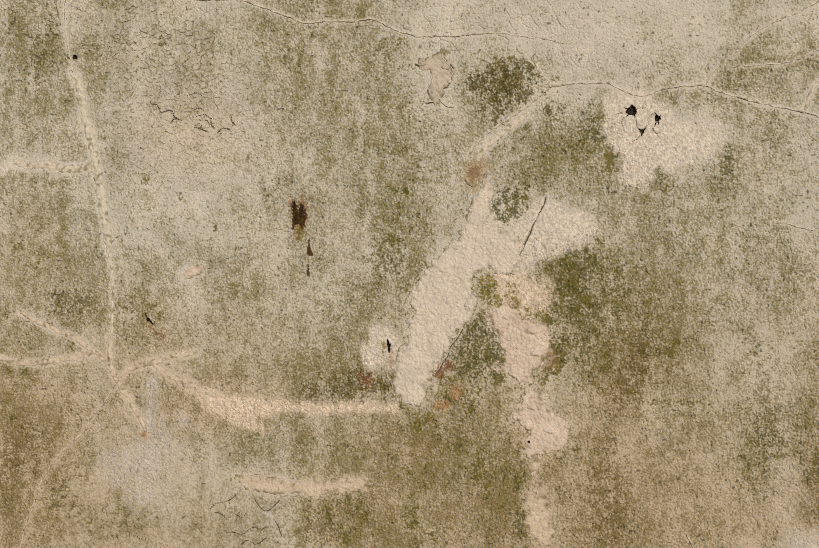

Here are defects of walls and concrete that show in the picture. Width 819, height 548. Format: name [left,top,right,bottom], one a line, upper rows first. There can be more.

peeling [418,47,456,107]
crack [467,0,819,162]
crack [0,0,564,548]
corrosion [286,193,314,277]
leakage [0,406,66,535]
peeling [391,172,600,548]
leakage [556,278,692,548]
leakage [726,347,803,517]